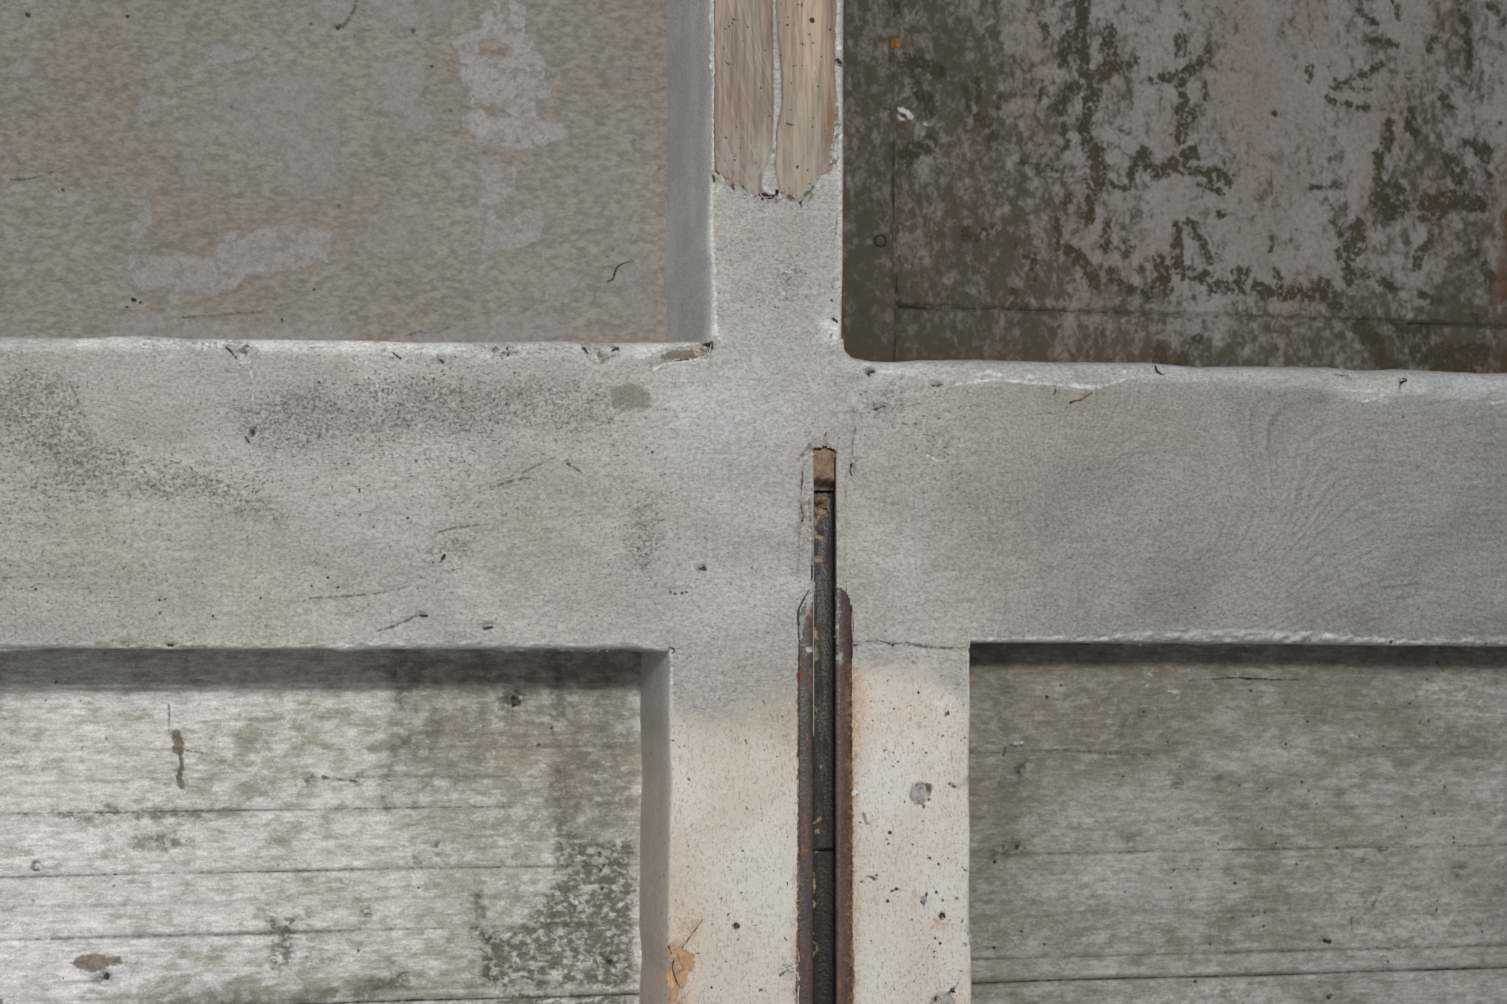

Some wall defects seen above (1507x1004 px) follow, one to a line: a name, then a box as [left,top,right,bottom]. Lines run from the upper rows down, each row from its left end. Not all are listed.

mould [1486,0,1506,28]
damp [898,53,946,167]
mould [961,76,1003,152]
damp [1007,0,1495,373]
mould [475,841,636,1004]